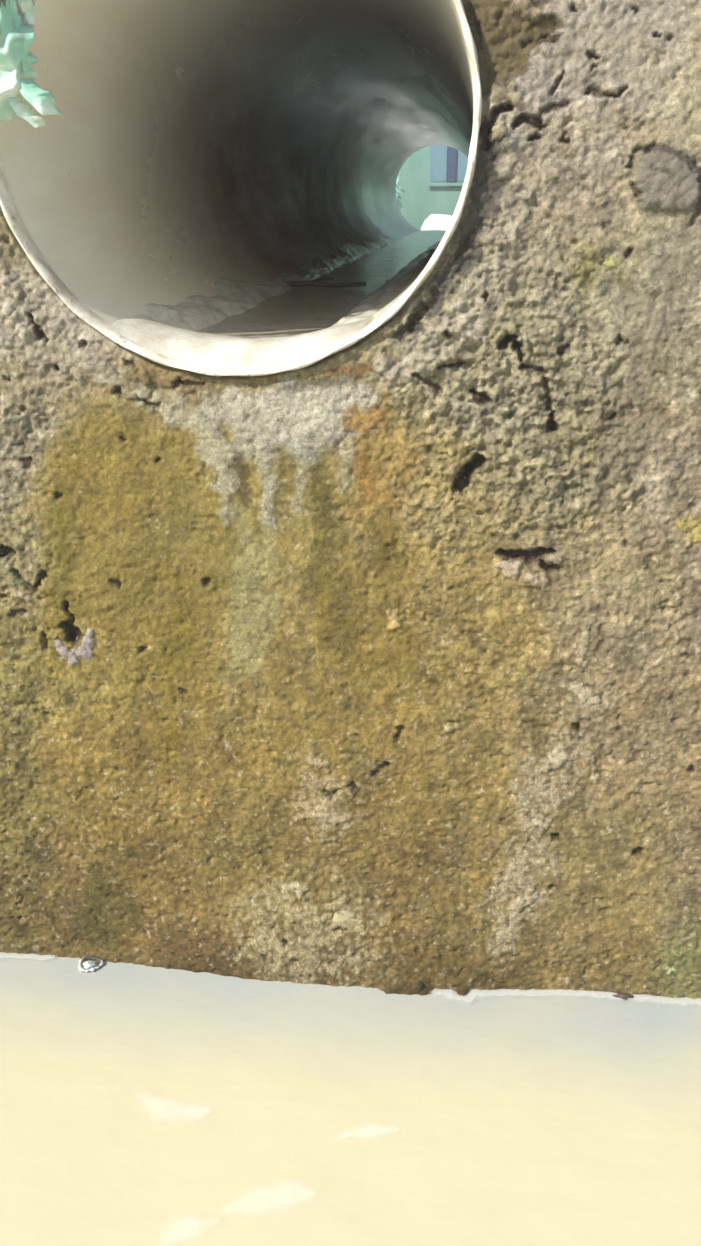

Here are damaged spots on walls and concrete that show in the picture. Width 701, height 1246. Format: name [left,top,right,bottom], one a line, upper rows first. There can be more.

spalling [43,601,94,666]
leakage [136,376,378,673]
rust [341,389,421,597]
spalling [495,547,563,588]